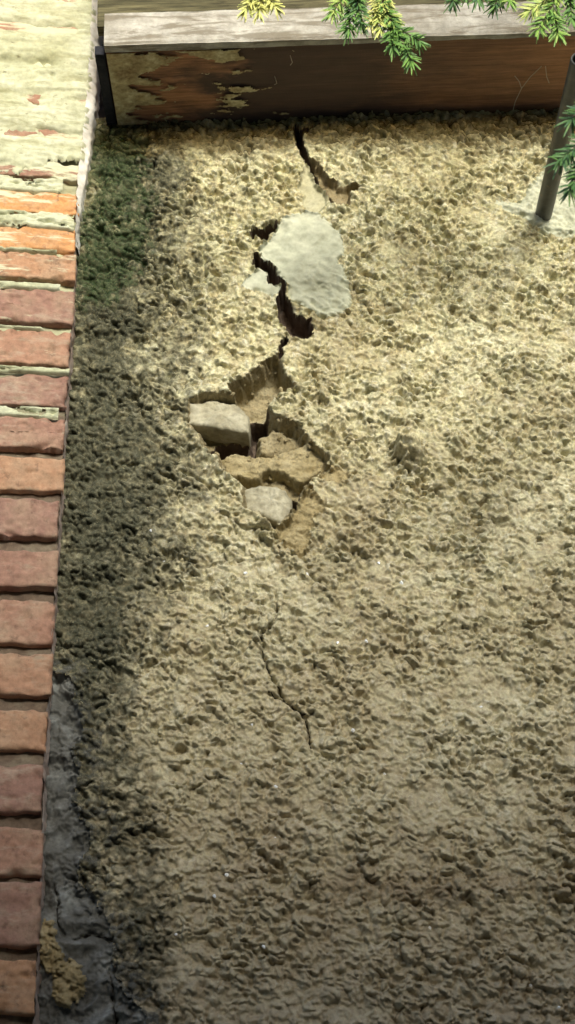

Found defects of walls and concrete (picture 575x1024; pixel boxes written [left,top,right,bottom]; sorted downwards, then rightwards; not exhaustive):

flaking render [0,0,272,256]
crack [292,123,361,212]
flaking render [0,281,60,292]
peeling [242,268,282,297]
crack [249,220,314,360]
flaking render [0,406,59,420]
flaking render [0,365,70,376]
spalling [187,351,351,559]
water stain [51,118,209,1000]